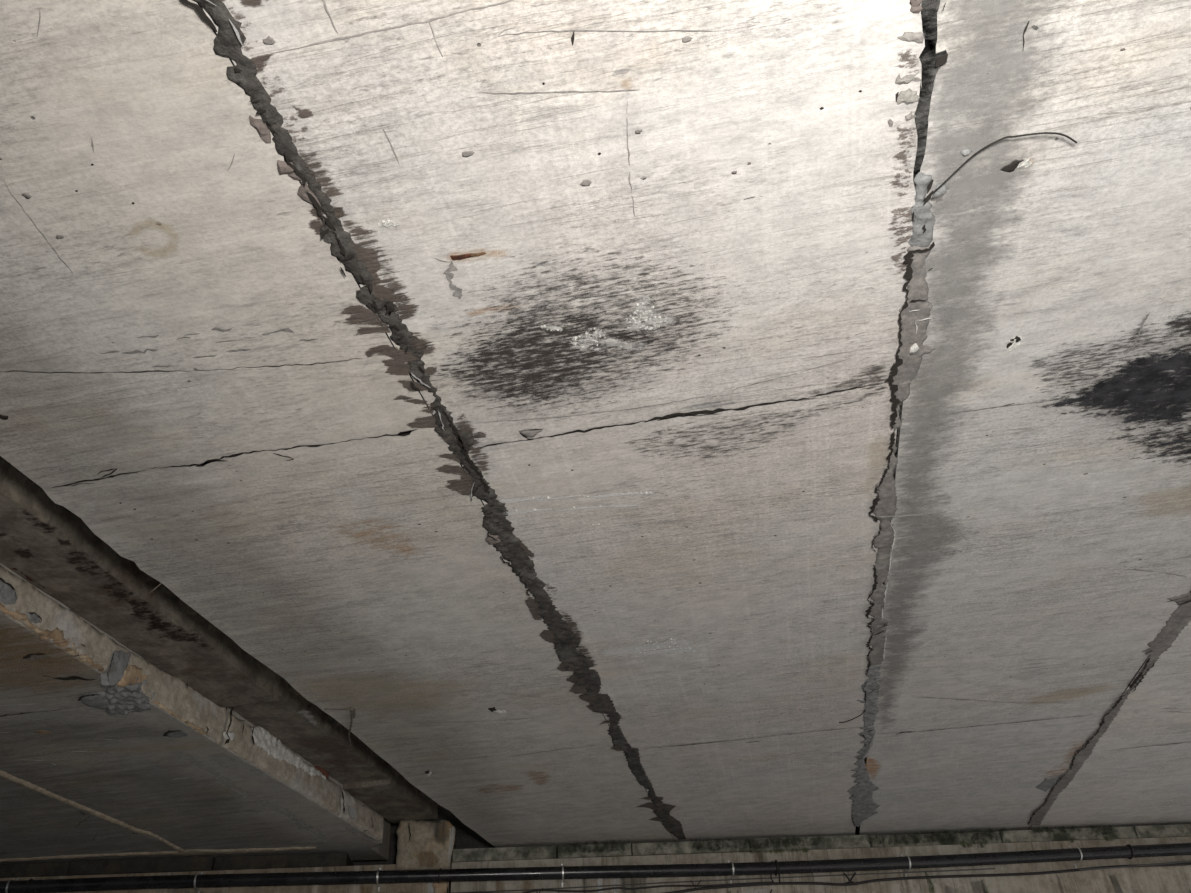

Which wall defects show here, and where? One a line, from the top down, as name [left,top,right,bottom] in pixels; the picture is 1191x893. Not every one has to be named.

crack [181,0,217,32]
crack [249,99,268,114]
crack [935,54,948,67]
crack [3,180,72,272]
damp [879,0,1046,710]
crack [0,152,1057,702]
crack [163,707,254,744]
crack [631,650,1190,826]